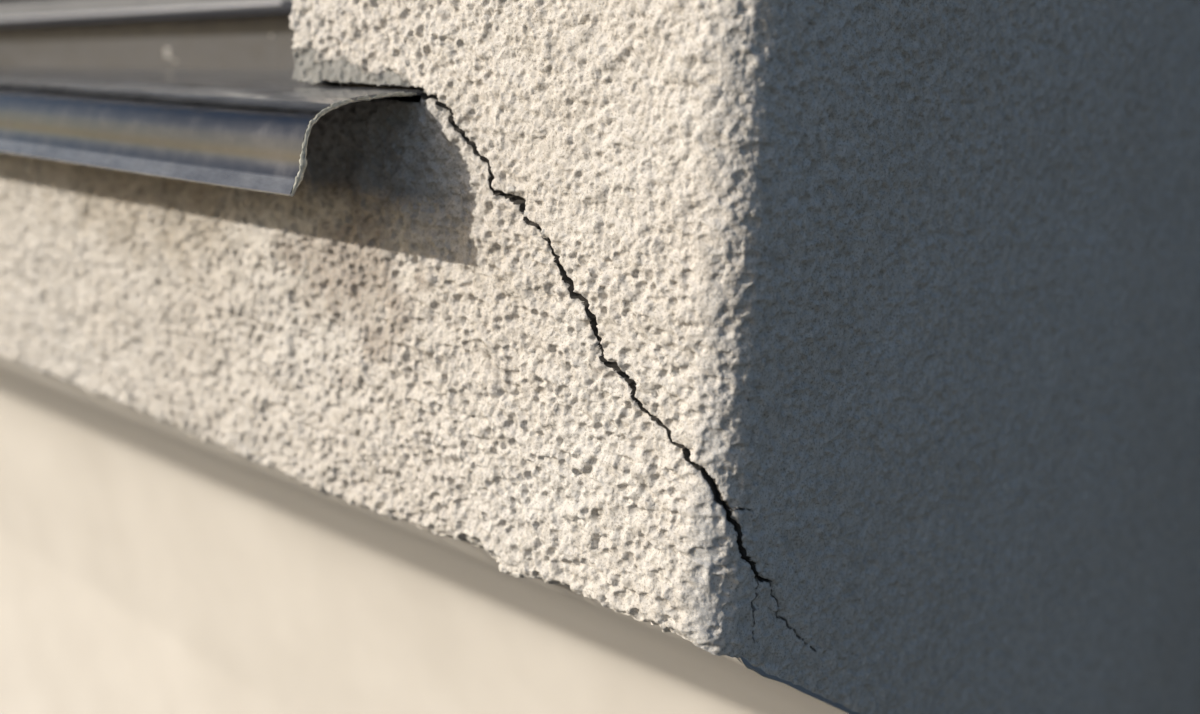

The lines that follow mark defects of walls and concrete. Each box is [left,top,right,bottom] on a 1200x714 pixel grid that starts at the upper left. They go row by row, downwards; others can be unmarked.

crack [417,87,816,651]